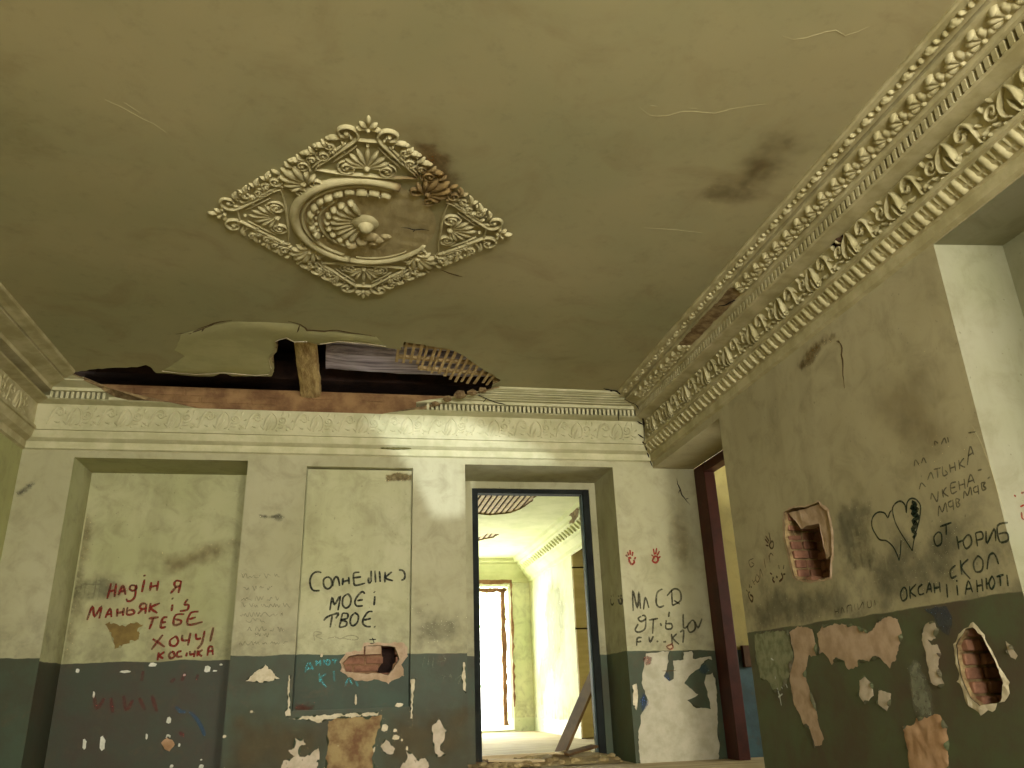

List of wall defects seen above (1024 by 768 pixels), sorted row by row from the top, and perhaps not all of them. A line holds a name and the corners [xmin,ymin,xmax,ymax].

flaking render [102,384,454,414]
spalling [274,339,296,361]
spalling [317,344,326,362]
crack [837,340,845,388]
spalling [782,500,834,583]
peeling [105,621,143,648]
spalling [246,665,447,768]
spalling [340,642,416,719]
peeling [632,650,720,763]
peeling [754,616,903,748]
spalling [902,714,950,768]
spalling [921,621,1018,715]